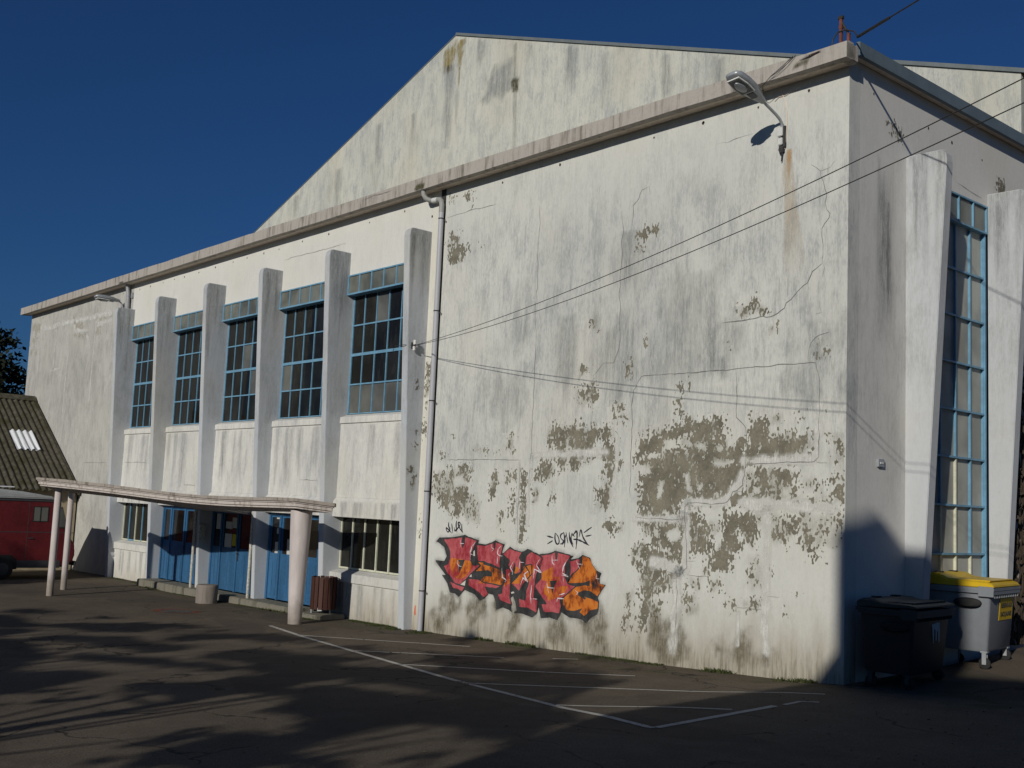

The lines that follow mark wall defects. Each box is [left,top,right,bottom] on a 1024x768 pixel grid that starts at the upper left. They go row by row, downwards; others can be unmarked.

damp [445,40,464,73]
damp [483,67,518,100]
peeling [444,229,485,266]
peeling [634,223,659,253]
crack [724,162,834,323]
peeling [735,291,779,336]
crack [629,309,828,626]
peeling [431,363,845,638]
damp [650,619,682,659]